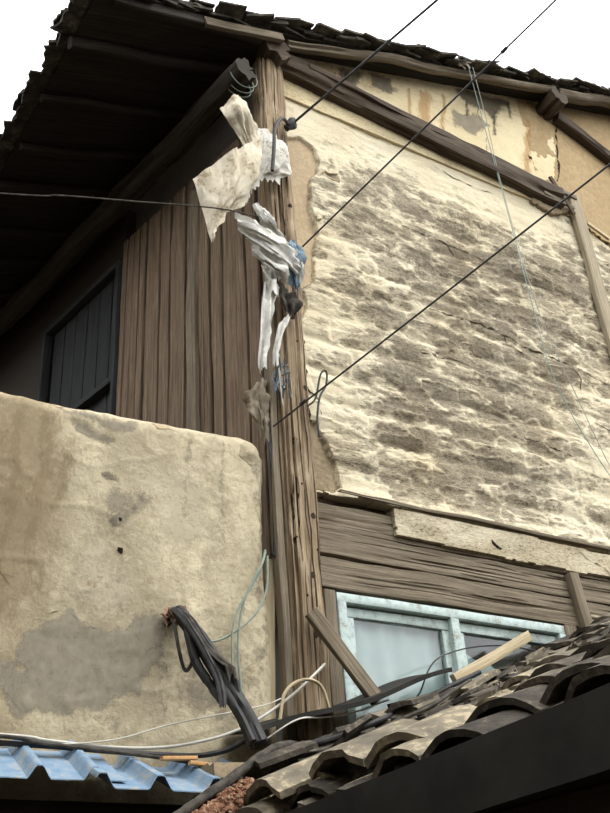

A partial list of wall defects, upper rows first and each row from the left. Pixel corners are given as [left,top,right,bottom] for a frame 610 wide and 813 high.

damp [452,89,511,135]
peeling [287,138,340,289]
crack [395,222,492,265]
crack [387,339,485,374]
crack [429,308,607,390]
spalling [309,417,340,493]
damp [0,541,167,718]